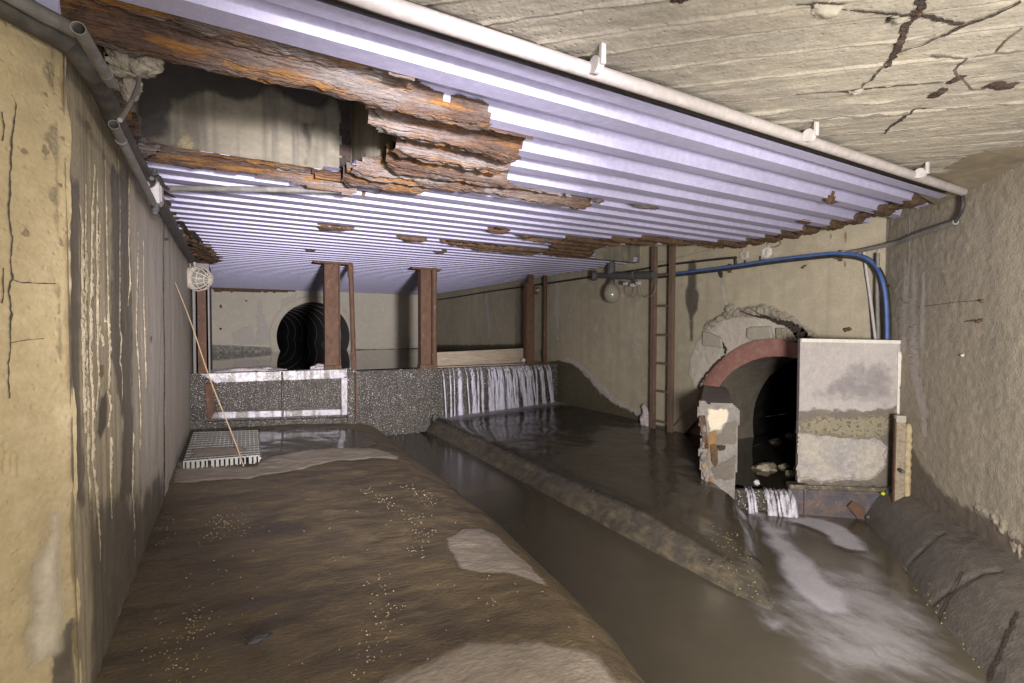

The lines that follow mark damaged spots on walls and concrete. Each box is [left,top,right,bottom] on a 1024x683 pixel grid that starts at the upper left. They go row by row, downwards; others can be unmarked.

spalling [103,48,165,102]
crack [796,0,1024,134]
spalling [177,135,193,150]
crack [1,95,56,398]
rust [396,194,940,258]
rust [822,191,839,204]
spalling [704,303,818,340]
leakage [70,158,163,683]